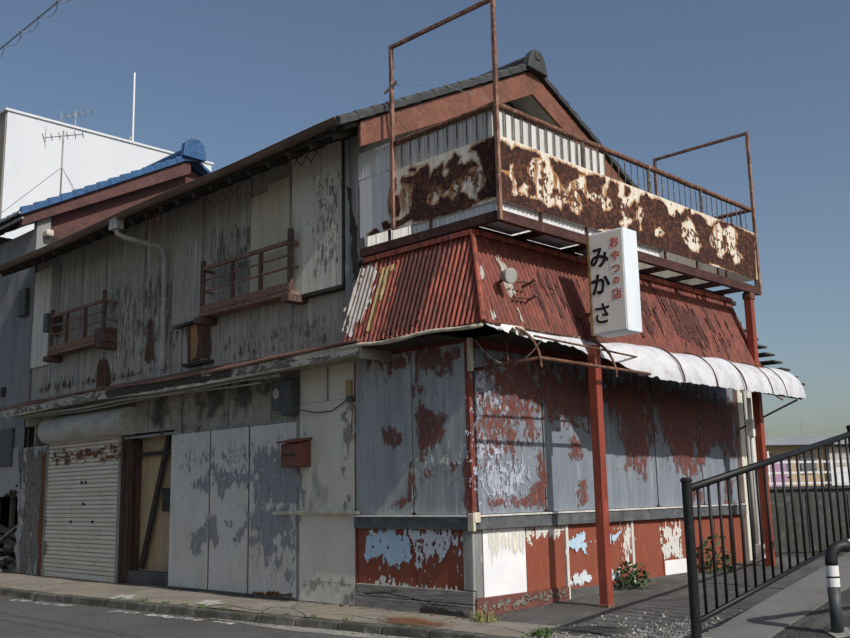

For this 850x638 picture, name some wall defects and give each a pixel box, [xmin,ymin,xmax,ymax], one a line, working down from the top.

corrosion [367,136,757,279]
peeling [342,260,398,337]
corrosion [382,245,443,335]
corrosion [530,269,579,328]
peeling [367,343,591,512]
corrosion [36,443,125,575]
peeling [364,529,463,591]
peeling [565,531,596,556]
peeling [610,521,632,580]
peeling [659,519,683,560]
crack [222,576,471,632]
peeling [480,570,592,613]